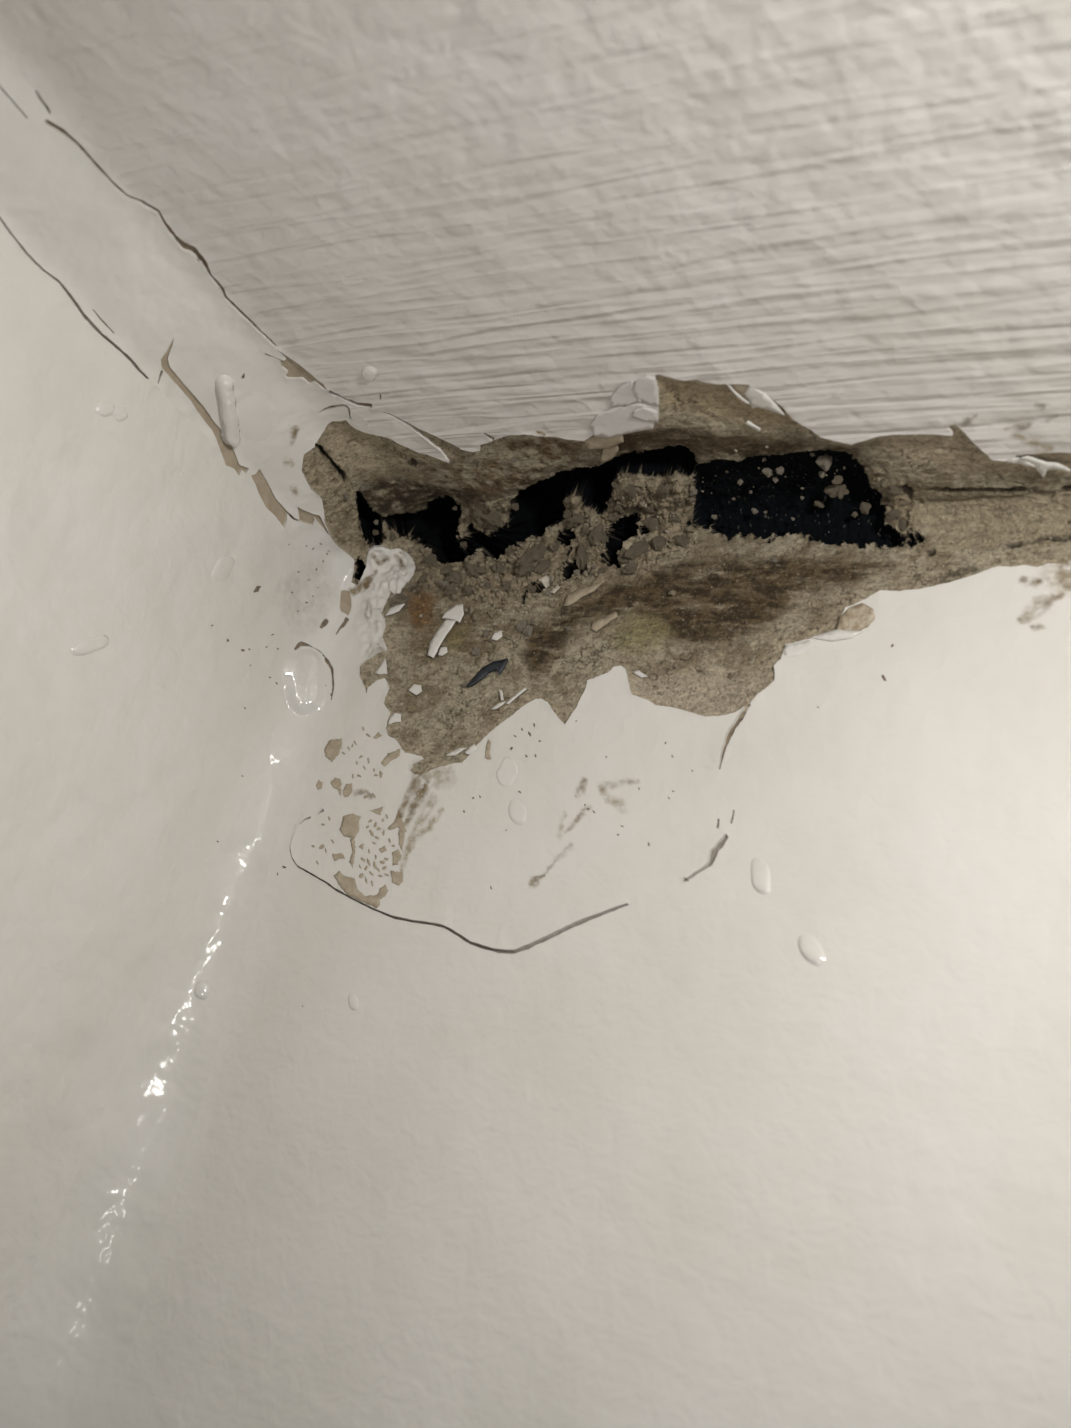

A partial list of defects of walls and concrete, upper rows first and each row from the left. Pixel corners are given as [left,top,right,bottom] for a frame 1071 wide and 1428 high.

crack [0,86,267,336]
crack [0,219,161,378]
flaking render [302,374,1071,908]
crack [293,859,619,954]
crack [688,813,734,880]